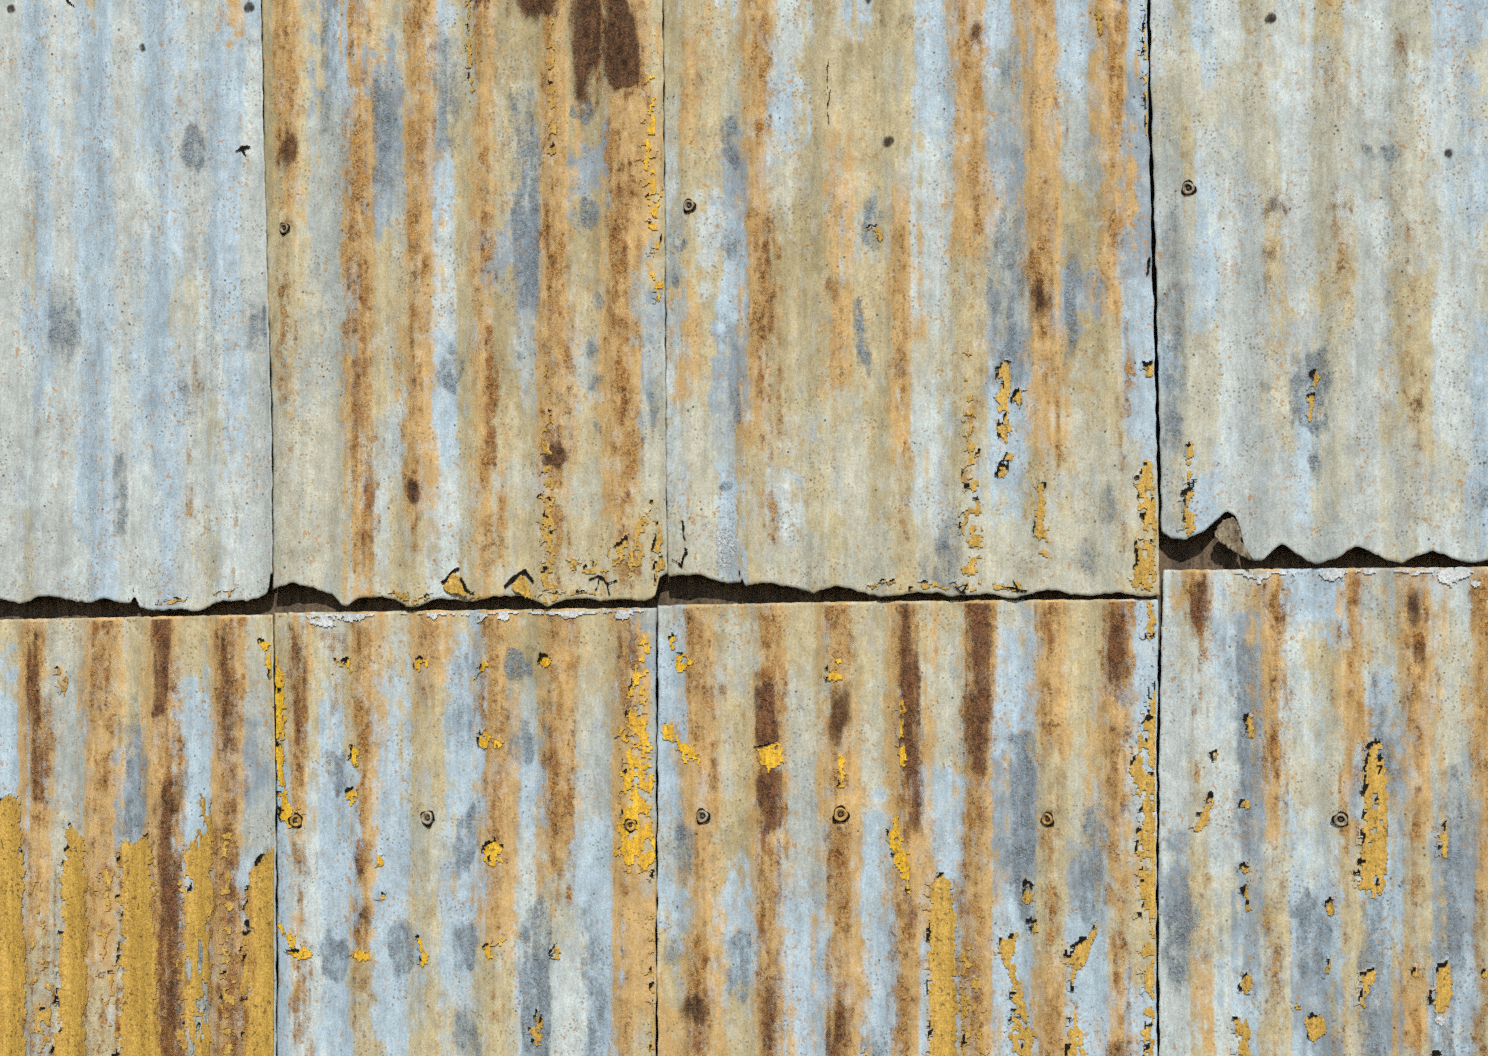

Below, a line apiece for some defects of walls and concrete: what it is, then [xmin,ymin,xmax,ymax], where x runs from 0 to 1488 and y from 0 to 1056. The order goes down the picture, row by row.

corrosion [473,0,649,110]
corrosion [343,78,380,573]
corrosion [536,179,574,487]
corrosion [604,129,643,587]
peeling [866,358,1028,591]
peeling [0,790,313,1056]
peeling [388,362,701,883]
corrosion [755,612,788,871]
peeling [886,815,991,1056]
corrosion [954,603,996,936]
peeling [993,878,1039,1056]
peeling [1350,737,1389,899]